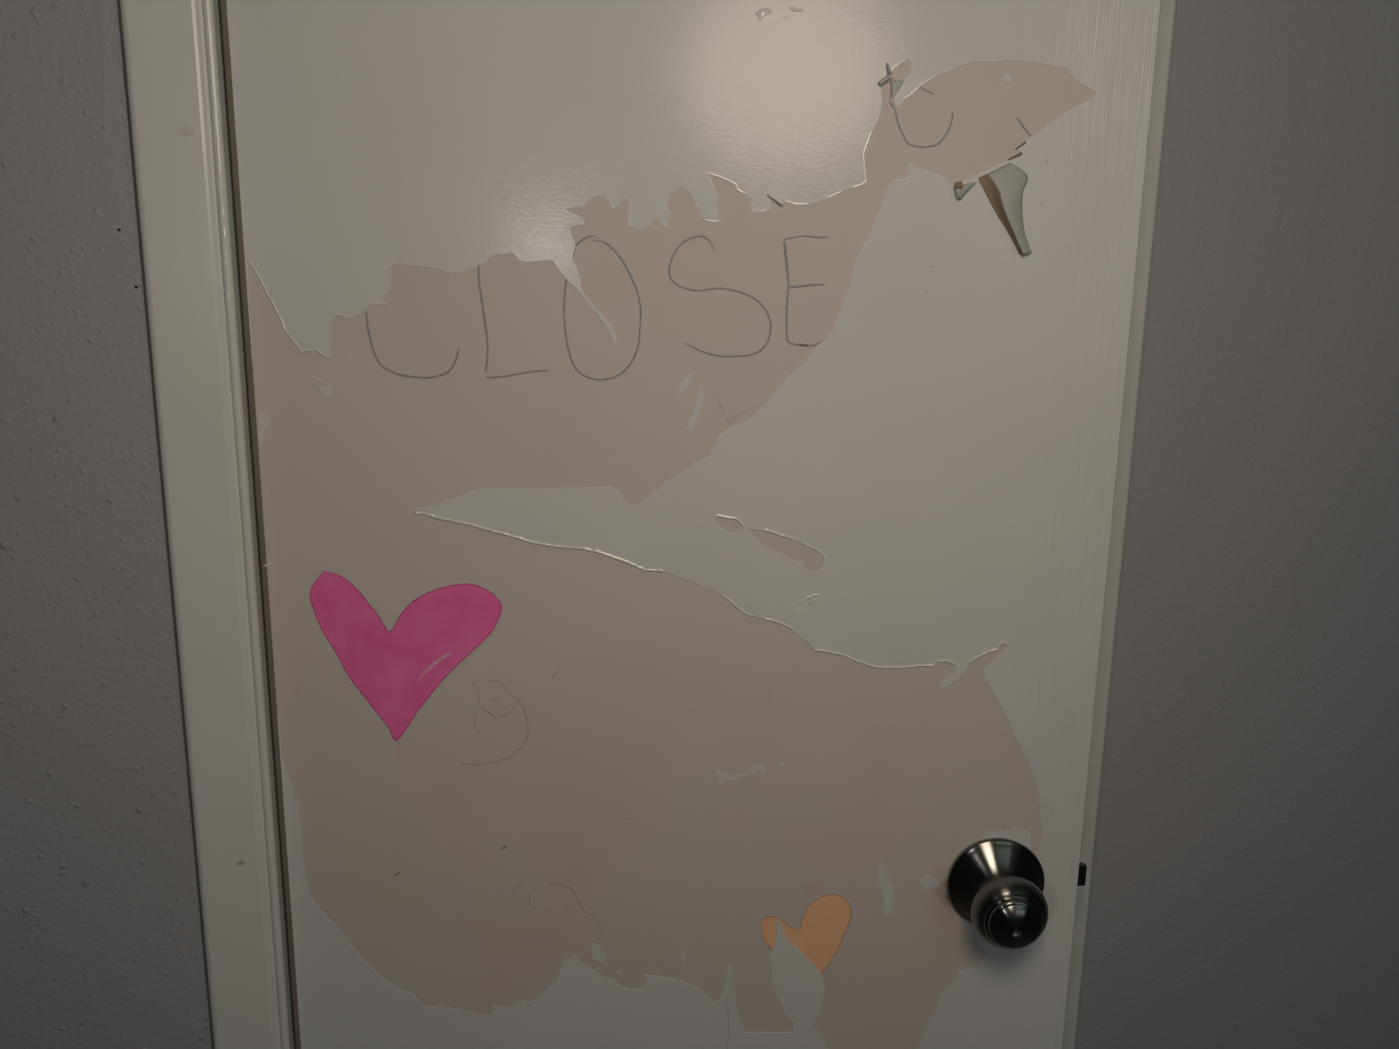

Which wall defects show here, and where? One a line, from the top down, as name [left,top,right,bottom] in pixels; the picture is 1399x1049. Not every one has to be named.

peeling [245,59,1098,1049]